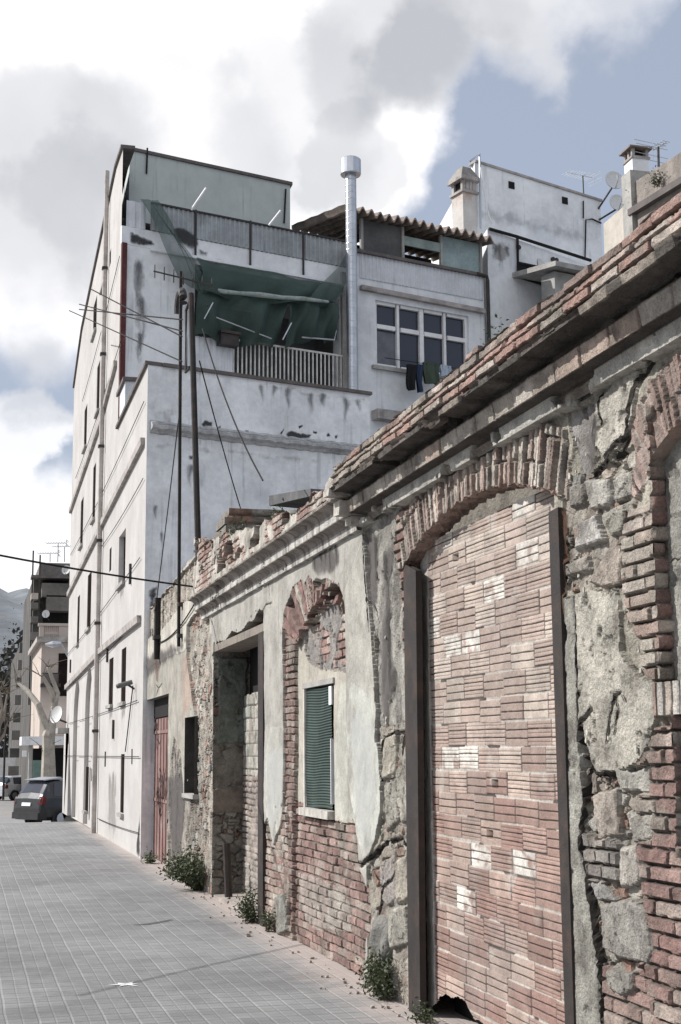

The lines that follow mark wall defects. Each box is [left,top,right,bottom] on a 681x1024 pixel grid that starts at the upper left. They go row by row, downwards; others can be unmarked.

peeling [280,425,337,438]
spalling [563,403,664,683]
crack [588,362,655,479]
spalling [167,609,264,894]
spalling [264,505,409,1007]